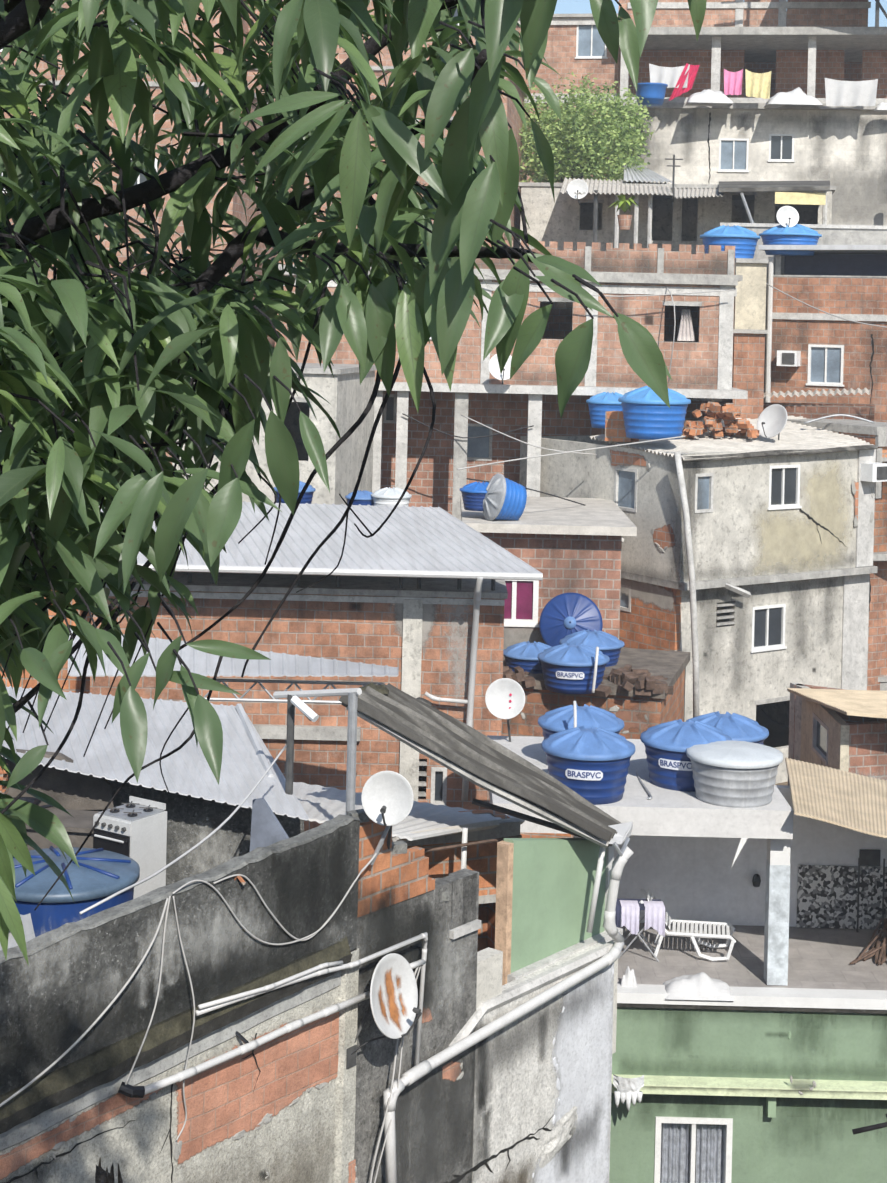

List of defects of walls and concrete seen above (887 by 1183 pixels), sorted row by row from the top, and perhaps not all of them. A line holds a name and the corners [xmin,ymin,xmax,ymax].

flaking render [652,520,675,553]
crack [799,508,845,546]
leakage [362,900,433,1003]
leakage [0,943,329,1083]
flaking render [172,1002,339,1164]
peeling [532,962,614,1183]
flaking render [0,1088,163,1180]
crack [160,1084,173,1183]
crack [449,1116,553,1183]